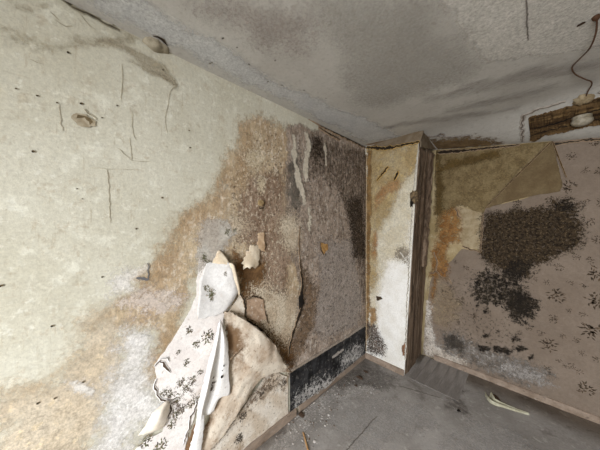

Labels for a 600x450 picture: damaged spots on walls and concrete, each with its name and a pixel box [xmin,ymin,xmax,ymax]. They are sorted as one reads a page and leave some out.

crack [523,0,531,41]
spalling [71,109,97,127]
crack [102,168,111,222]
peeling [484,141,567,209]
damp [0,115,418,450]
peeling [241,231,266,270]
crack [240,226,305,357]
corrosion [430,207,462,322]
damp [423,133,589,387]
peeling [197,295,292,450]
peeling [138,400,170,436]